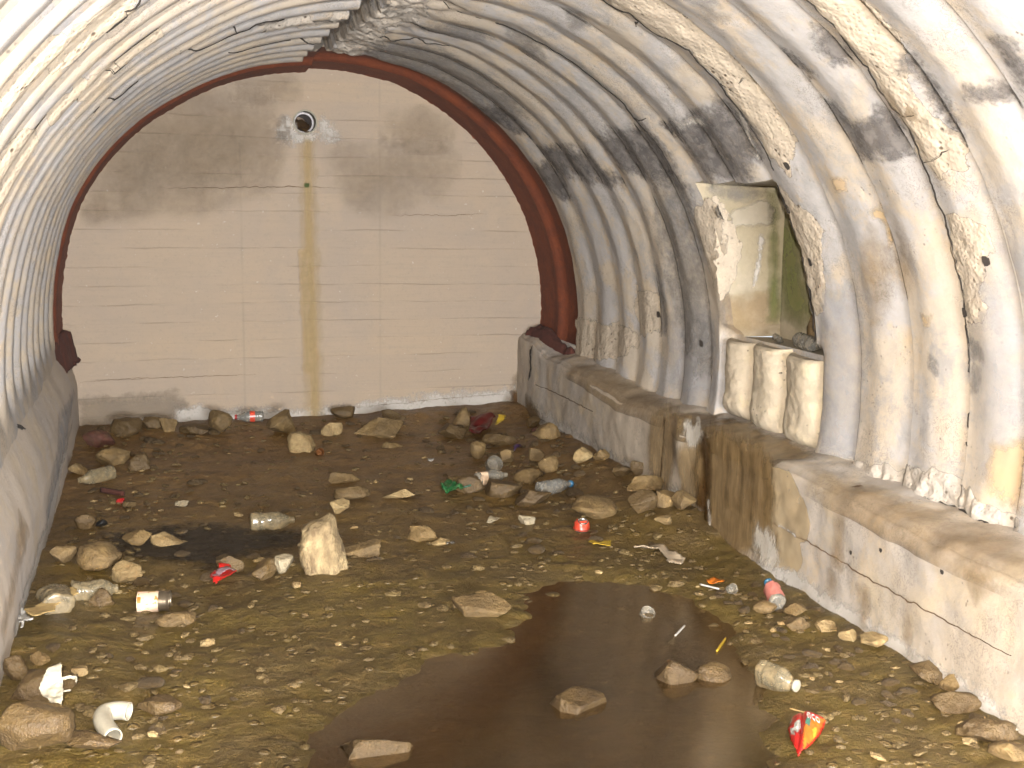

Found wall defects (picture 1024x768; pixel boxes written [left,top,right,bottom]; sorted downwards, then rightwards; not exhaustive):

spalling [258,0,430,56]
crack [160,183,341,191]
leakage [276,116,340,142]
spalling [605,0,826,316]
spalling [808,0,970,180]
spalling [946,213,996,328]
leakage [509,378,630,467]
spalling [840,457,1019,532]
leakage [649,410,1001,719]
crack [774,523,1011,656]